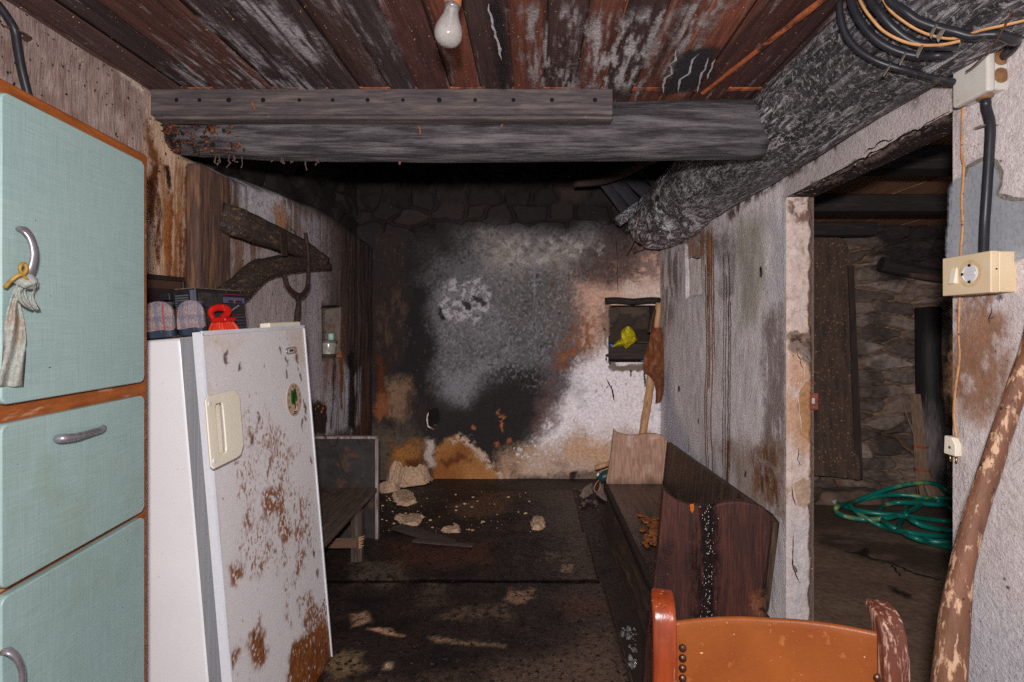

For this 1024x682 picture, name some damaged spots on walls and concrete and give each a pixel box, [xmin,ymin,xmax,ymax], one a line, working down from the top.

mould [526,5,670,90]
leakage [657,0,722,94]
rust [155,168,186,284]
rust [373,355,389,422]
spalling [426,408,439,430]
leakage [390,433,503,479]
leakage [722,256,731,482]
leakage [751,448,778,506]